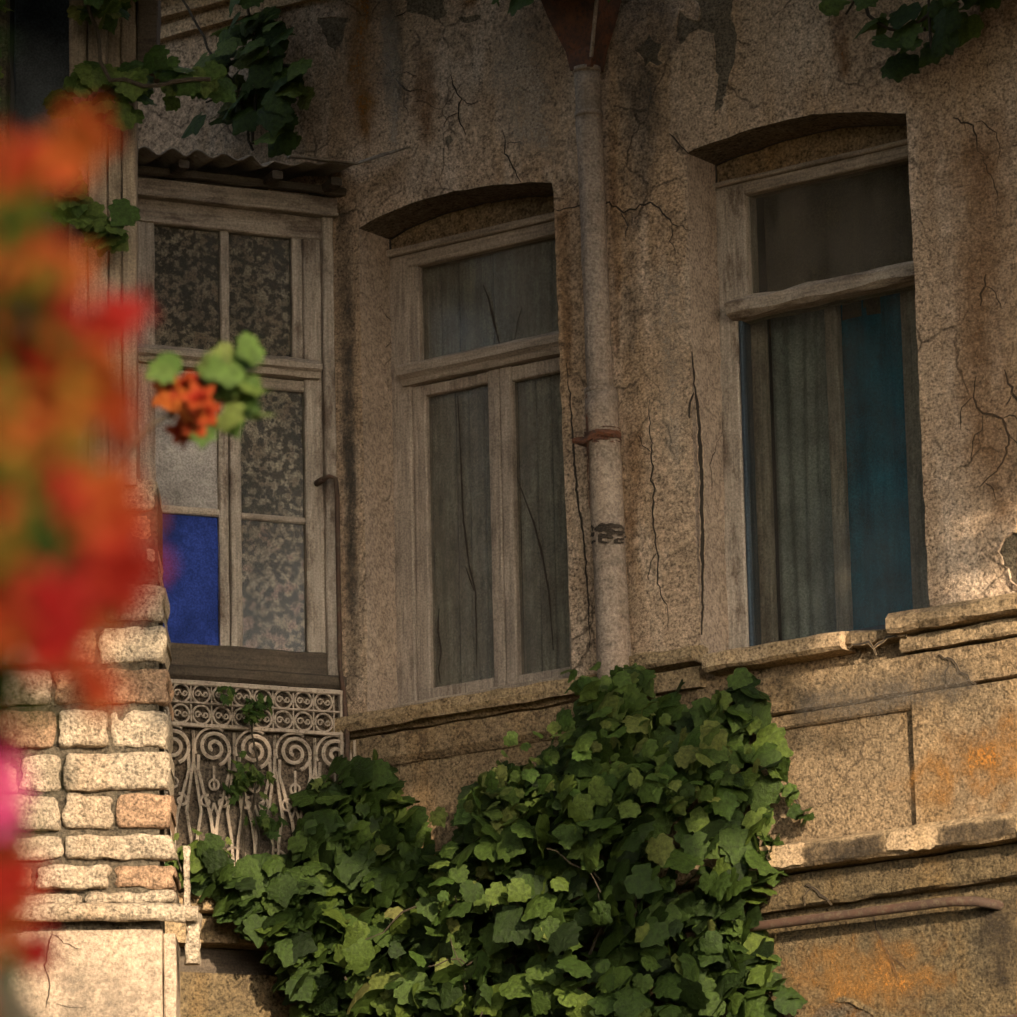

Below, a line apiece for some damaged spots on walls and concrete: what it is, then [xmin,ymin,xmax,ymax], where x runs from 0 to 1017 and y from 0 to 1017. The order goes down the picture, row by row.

crack [443,75,482,133]
flaking render [672,0,742,113]
crack [953,117,1001,216]
crack [606,201,691,251]
crack [978,274,1001,309]
crack [566,363,591,648]
corrosion [584,394,622,509]
crack [638,400,669,627]
crack [687,351,723,635]
crack [959,369,1017,500]
spalling [992,527,1017,591]